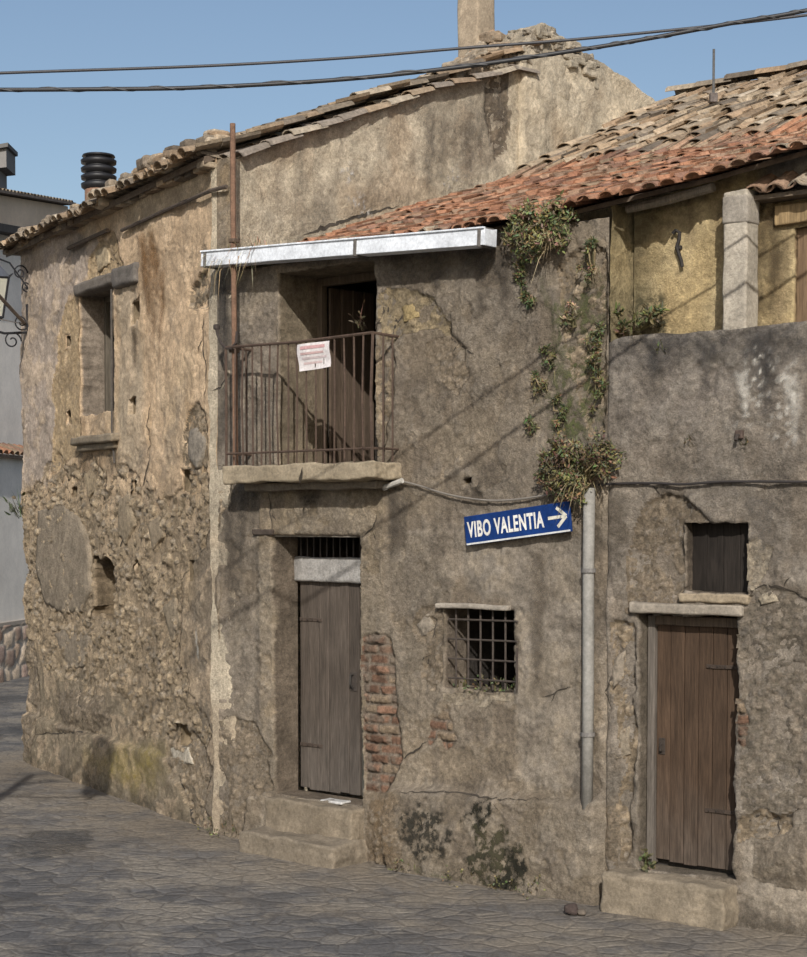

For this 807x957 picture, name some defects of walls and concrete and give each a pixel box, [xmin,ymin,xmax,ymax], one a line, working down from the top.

spalling [189,272,210,311]
spalling [21,295,274,839]
crack [753,578,807,600]
flaking render [360,633,403,794]
spalling [412,605,515,750]
mould [400,803,452,862]
crack [393,791,552,810]
mould [460,799,528,890]